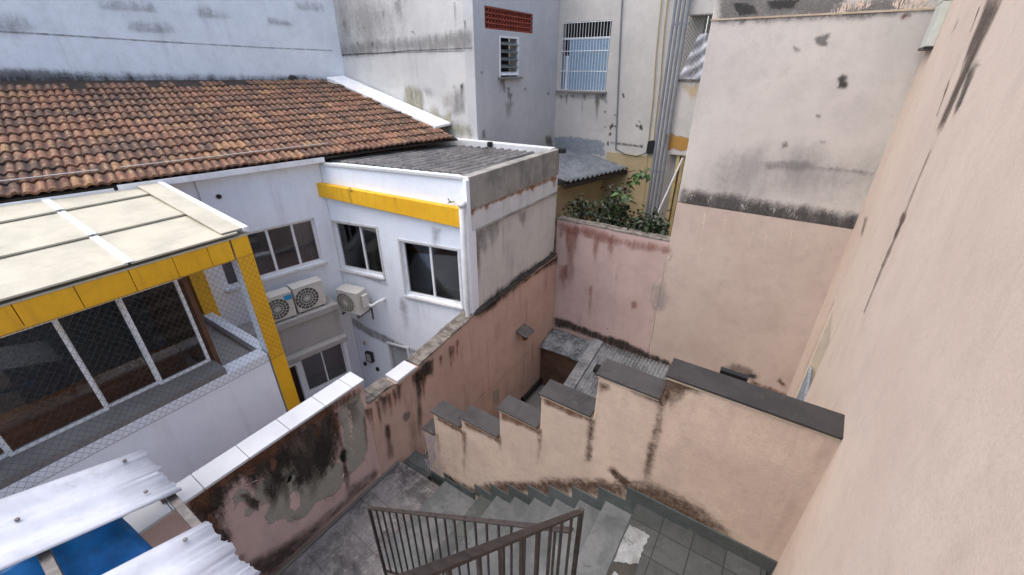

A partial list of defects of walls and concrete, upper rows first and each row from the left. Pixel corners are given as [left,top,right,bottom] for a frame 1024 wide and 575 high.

rust [471,177,555,214]
leakage [482,219,667,314]
leakage [681,190,858,273]
peeling [233,393,368,525]
leakage [412,340,723,530]